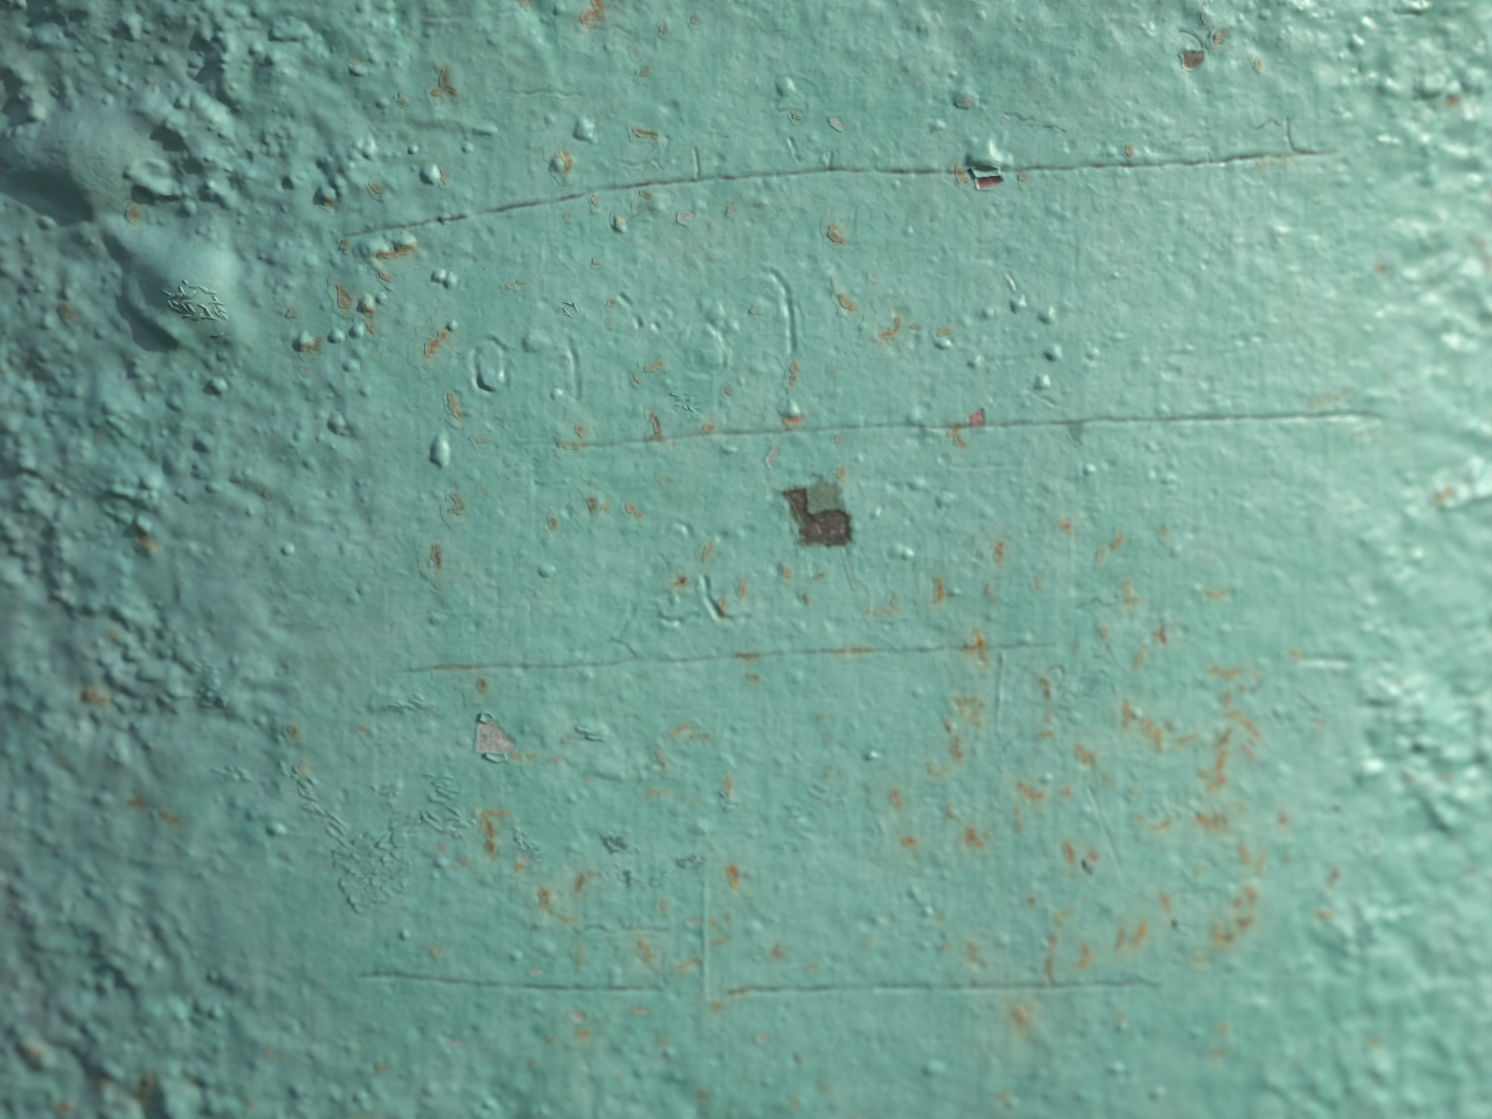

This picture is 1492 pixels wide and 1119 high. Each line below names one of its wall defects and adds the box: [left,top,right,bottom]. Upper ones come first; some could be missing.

crack [320,107,1359,250]
peeling [970,165,1005,190]
crack [470,330,1401,458]
peeling [774,473,861,590]
peeling [474,712,519,762]
crack [340,918,679,1002]
crack [714,974,970,1003]
crack [1069,970,1153,997]